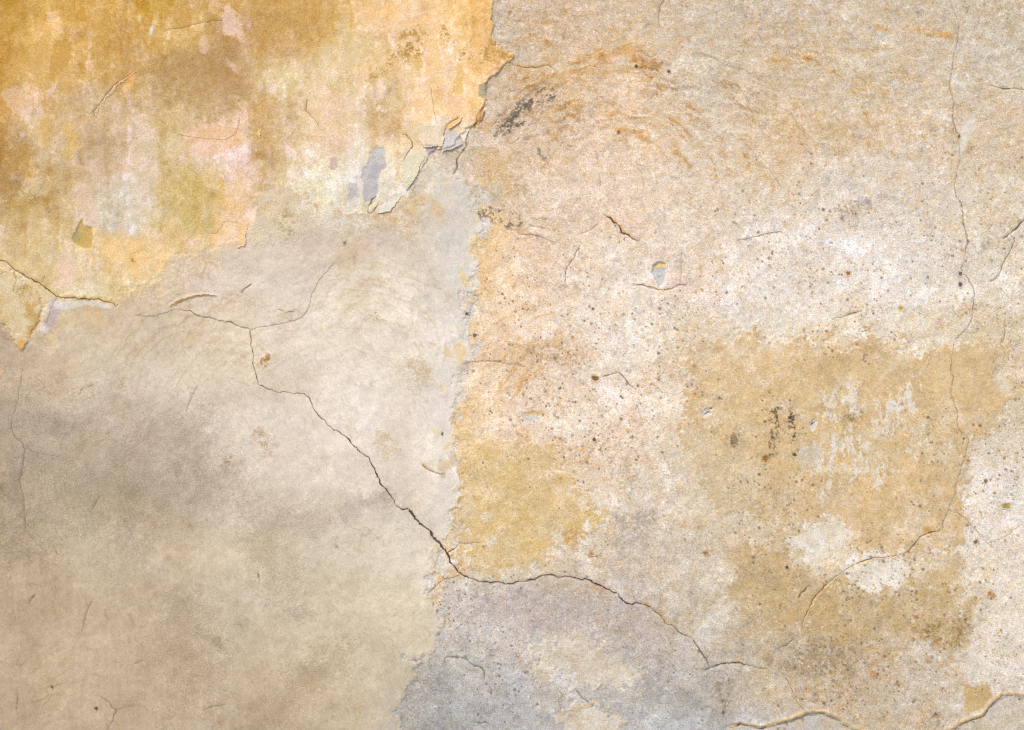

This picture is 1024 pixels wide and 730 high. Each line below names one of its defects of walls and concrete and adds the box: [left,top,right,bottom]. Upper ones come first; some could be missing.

peeling [0,0,499,359]
crack [0,257,118,324]
crack [134,0,1024,671]
crack [10,369,59,552]
water stain [724,432,745,450]
mould [767,406,798,462]
crack [444,656,485,679]